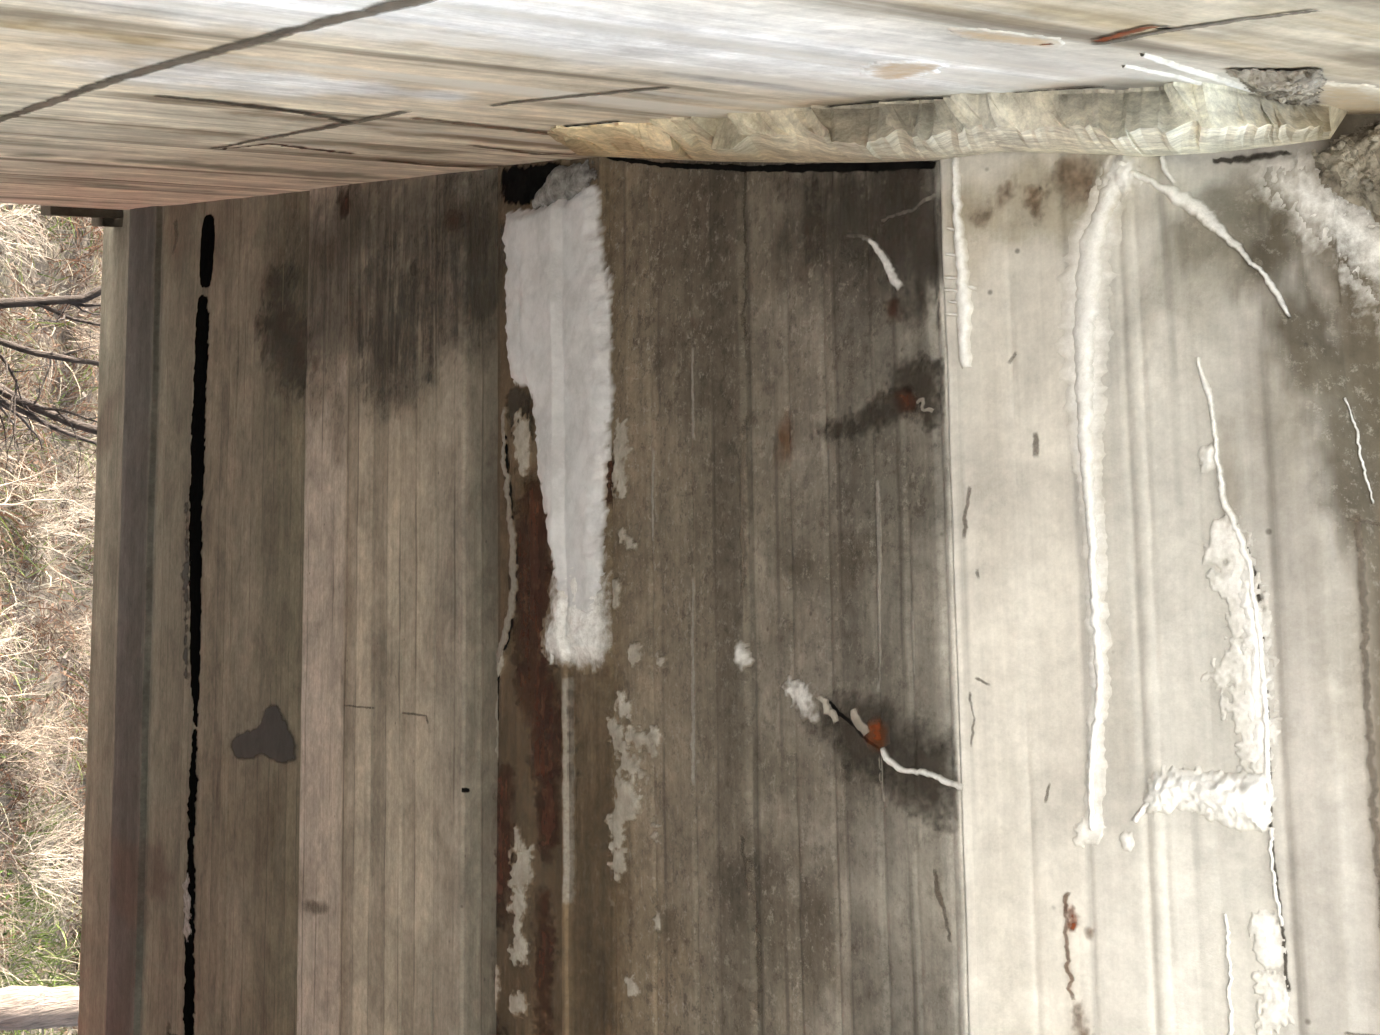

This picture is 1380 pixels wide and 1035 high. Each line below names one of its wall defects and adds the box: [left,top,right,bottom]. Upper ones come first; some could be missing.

crack [156,96,353,124]
spalling [1226,68,1327,107]
damp [1244,146,1380,344]
rust [824,357,945,439]
damp [255,159,618,905]
damp [1055,155,1277,852]
rust [495,482,614,1035]